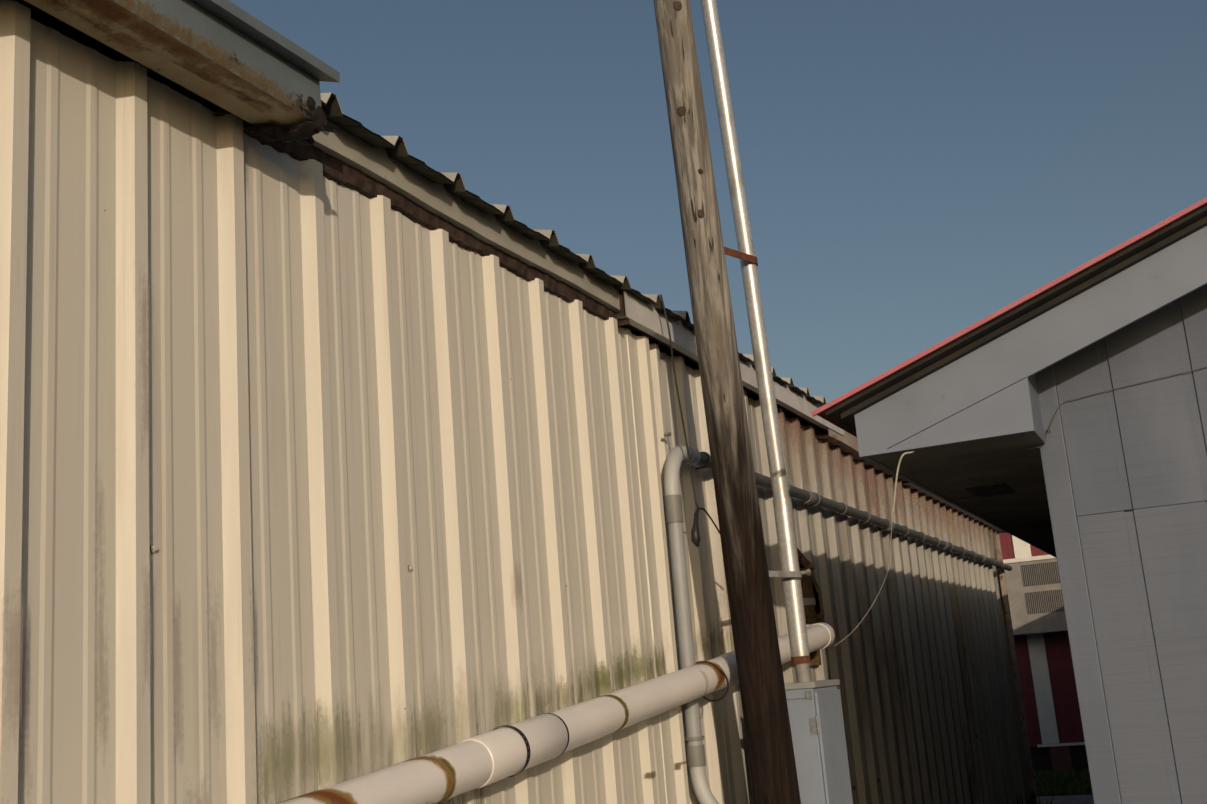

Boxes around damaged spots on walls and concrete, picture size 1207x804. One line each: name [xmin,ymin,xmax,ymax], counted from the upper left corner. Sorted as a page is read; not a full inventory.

corrosion [41,0,306,114]